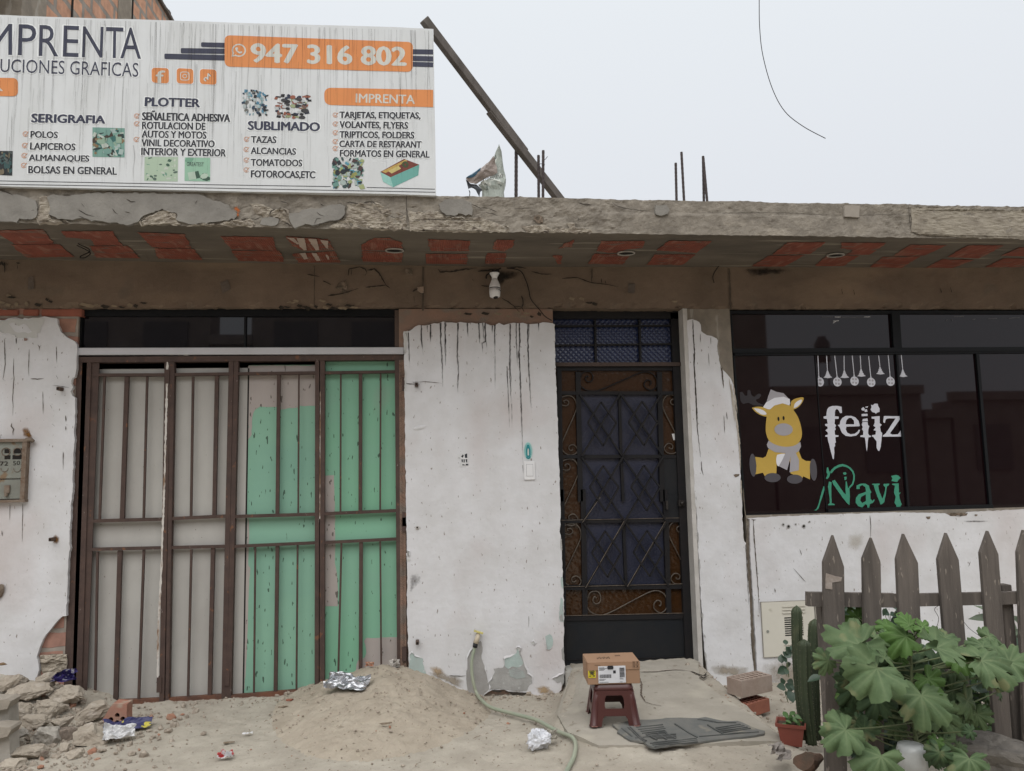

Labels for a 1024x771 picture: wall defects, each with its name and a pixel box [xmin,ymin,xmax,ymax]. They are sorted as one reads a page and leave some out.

spalling [139,203,290,228]
peeling [0,294,53,341]
water stain [406,322,496,388]
water stain [507,323,539,423]
peeling [409,651,426,674]
peeling [465,634,565,695]